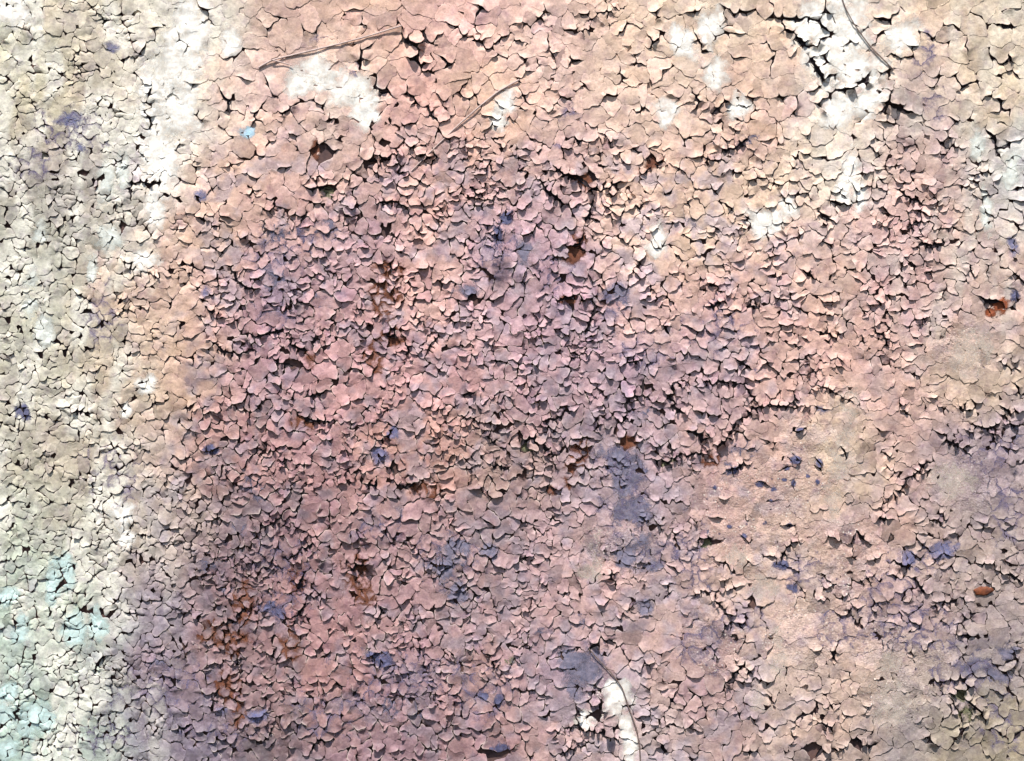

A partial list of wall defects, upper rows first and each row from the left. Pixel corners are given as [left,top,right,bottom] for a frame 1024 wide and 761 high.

crack [402,28,452,68]
crack [782,0,869,92]
peeling [369,0,1024,295]
crack [955,73,1022,157]
crack [538,148,663,247]
crack [899,190,945,276]
peeling [0,0,497,761]
crack [208,299,336,367]
crack [487,359,802,472]
peeling [320,120,1024,650]
corrosion [985,297,1008,317]
peeling [285,377,1024,761]